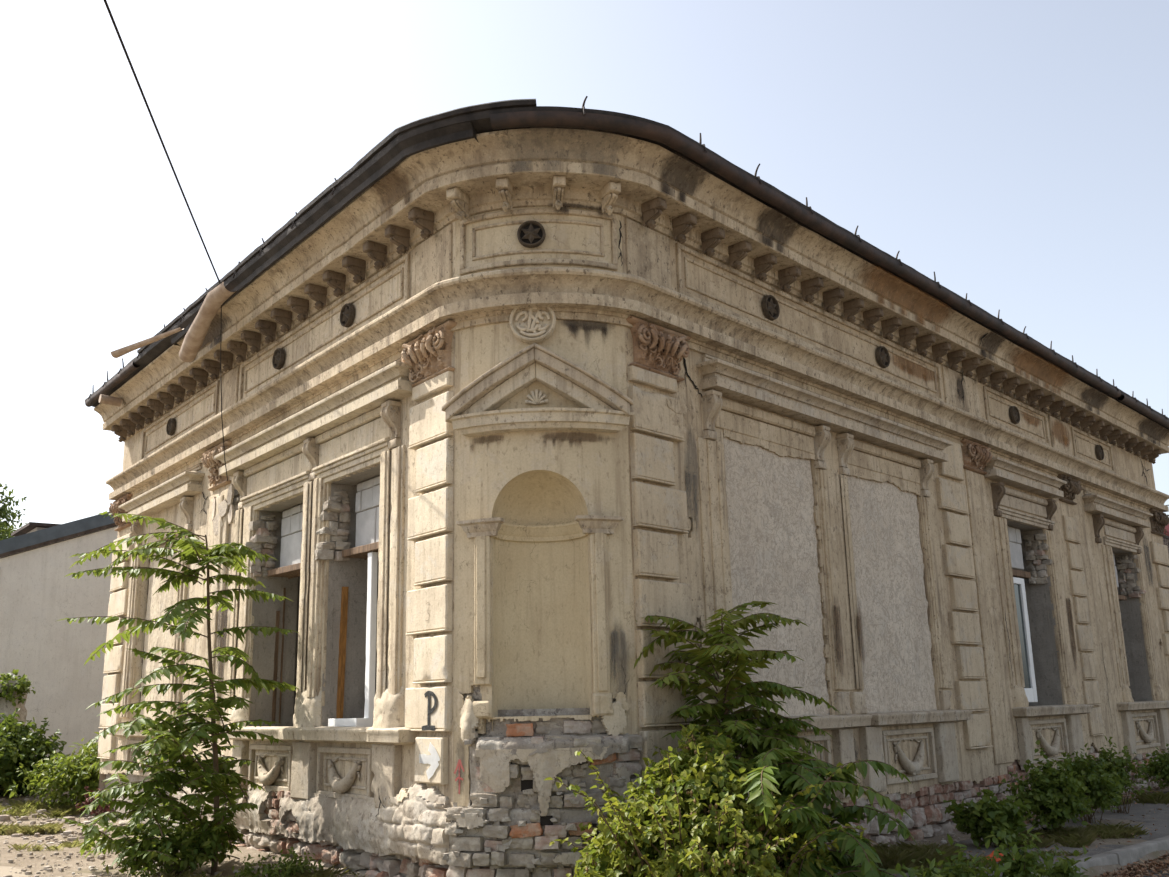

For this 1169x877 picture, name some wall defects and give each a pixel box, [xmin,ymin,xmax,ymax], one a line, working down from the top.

water stain [662,154,706,202]
crack [616,220,624,266]
water stain [759,208,797,253]
spalling [442,675,644,877]
flaking render [822,759,1065,846]